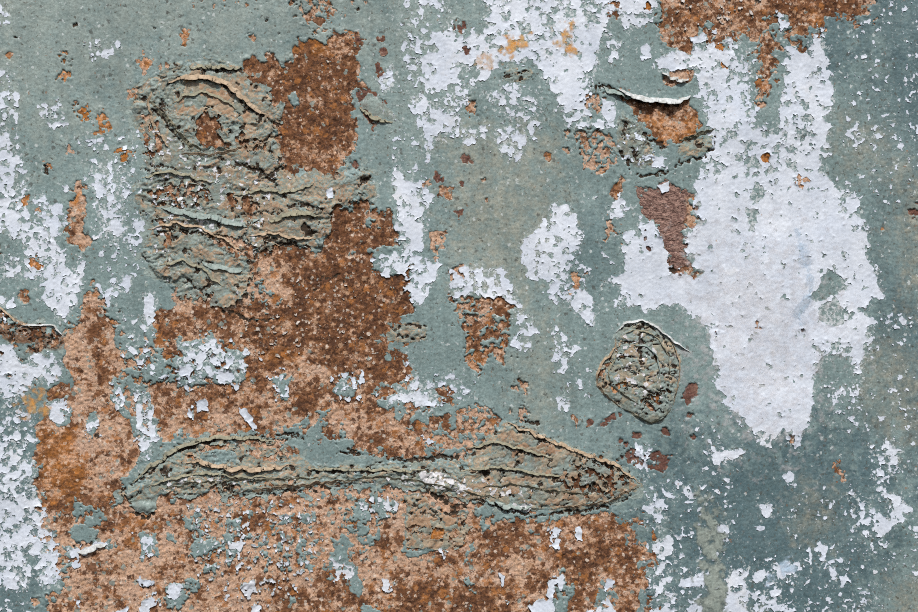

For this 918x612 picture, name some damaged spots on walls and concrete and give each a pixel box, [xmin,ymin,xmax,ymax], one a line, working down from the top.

peeling [0,70,86,325]
peeling [0,344,108,612]
peeling [78,130,278,308]
rust [147,178,213,248]
rust [195,0,388,179]
rust [0,192,673,612]
peeling [388,361,479,408]
peeling [370,0,658,352]
rust [617,88,703,147]
rust [636,179,703,280]
peeling [601,0,918,612]
rust [643,0,878,111]